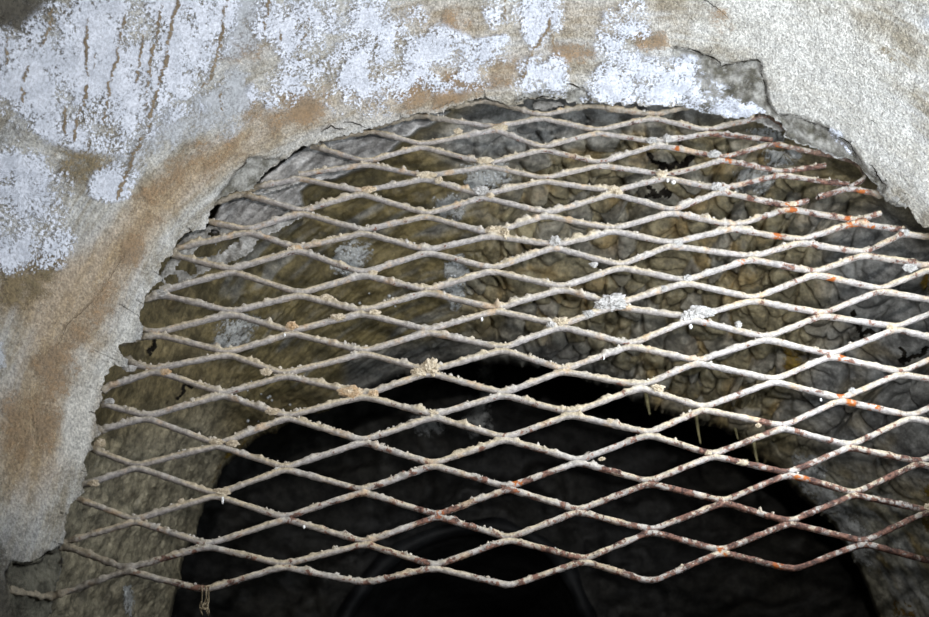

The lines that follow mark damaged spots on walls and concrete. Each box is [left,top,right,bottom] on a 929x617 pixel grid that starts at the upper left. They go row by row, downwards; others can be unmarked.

leakage [0,0,571,312]
spalling [515,87,592,104]
leakage [579,0,803,195]
spalling [672,46,909,208]
peeling [160,217,302,285]
spalling [6,549,62,617]